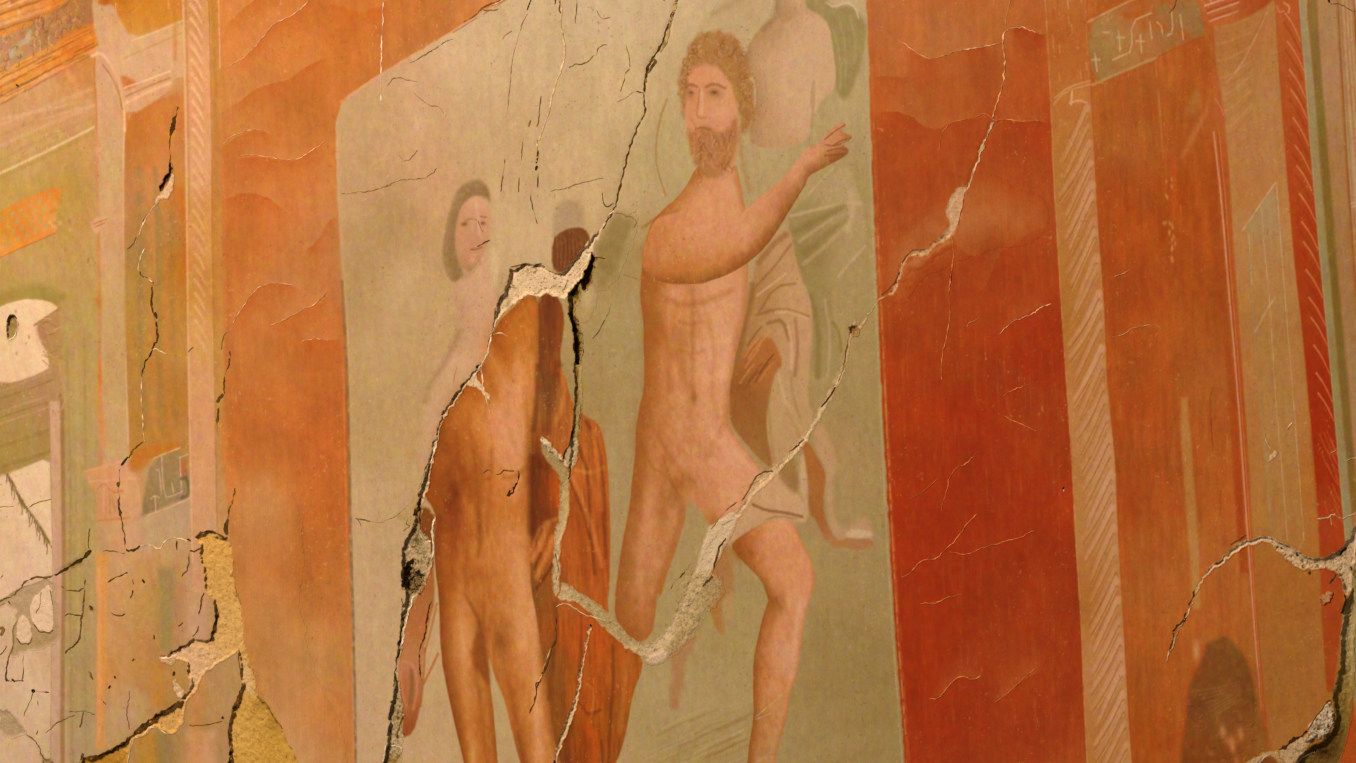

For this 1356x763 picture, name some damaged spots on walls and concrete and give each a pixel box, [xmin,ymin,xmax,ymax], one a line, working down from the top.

crack [341,150,436,194]
crack [387,40,448,112]
crack [500,0,678,232]
crack [847,0,1050,379]
crack [0,107,332,734]
peeling [79,530,298,763]
crack [355,309,498,763]
crack [1167,590,1195,660]
crack [1317,512,1356,525]